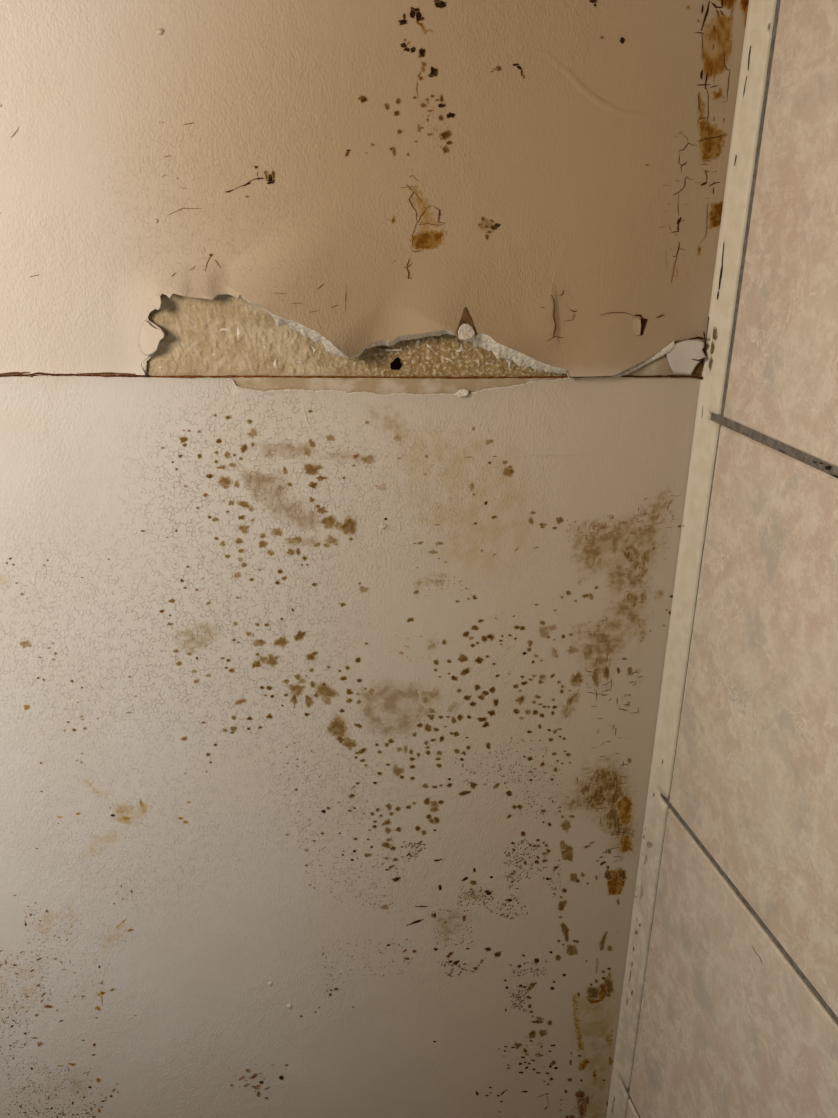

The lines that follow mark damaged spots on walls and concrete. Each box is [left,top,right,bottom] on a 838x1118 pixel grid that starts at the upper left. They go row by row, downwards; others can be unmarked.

leakage [384,7,456,157]
leakage [476,216,501,241]
crack [716,243,724,299]
peeling [146,294,718,395]
leakage [159,401,682,1085]
leakage [72,753,153,870]